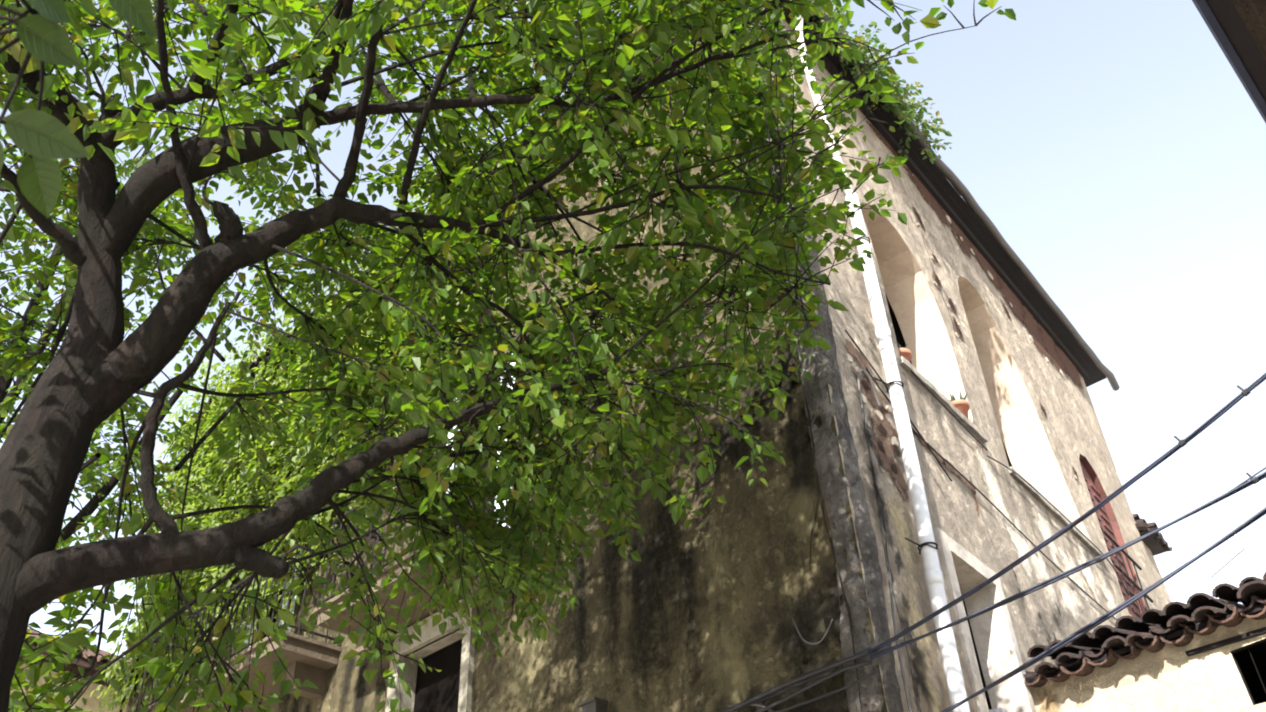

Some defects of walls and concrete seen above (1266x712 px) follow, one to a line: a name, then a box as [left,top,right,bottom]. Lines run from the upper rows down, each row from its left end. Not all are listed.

water stain [694,353,821,502]
water stain [572,545,585,676]
water stain [602,495,700,681]
water stain [738,567,846,712]
spalling [845,340,976,712]